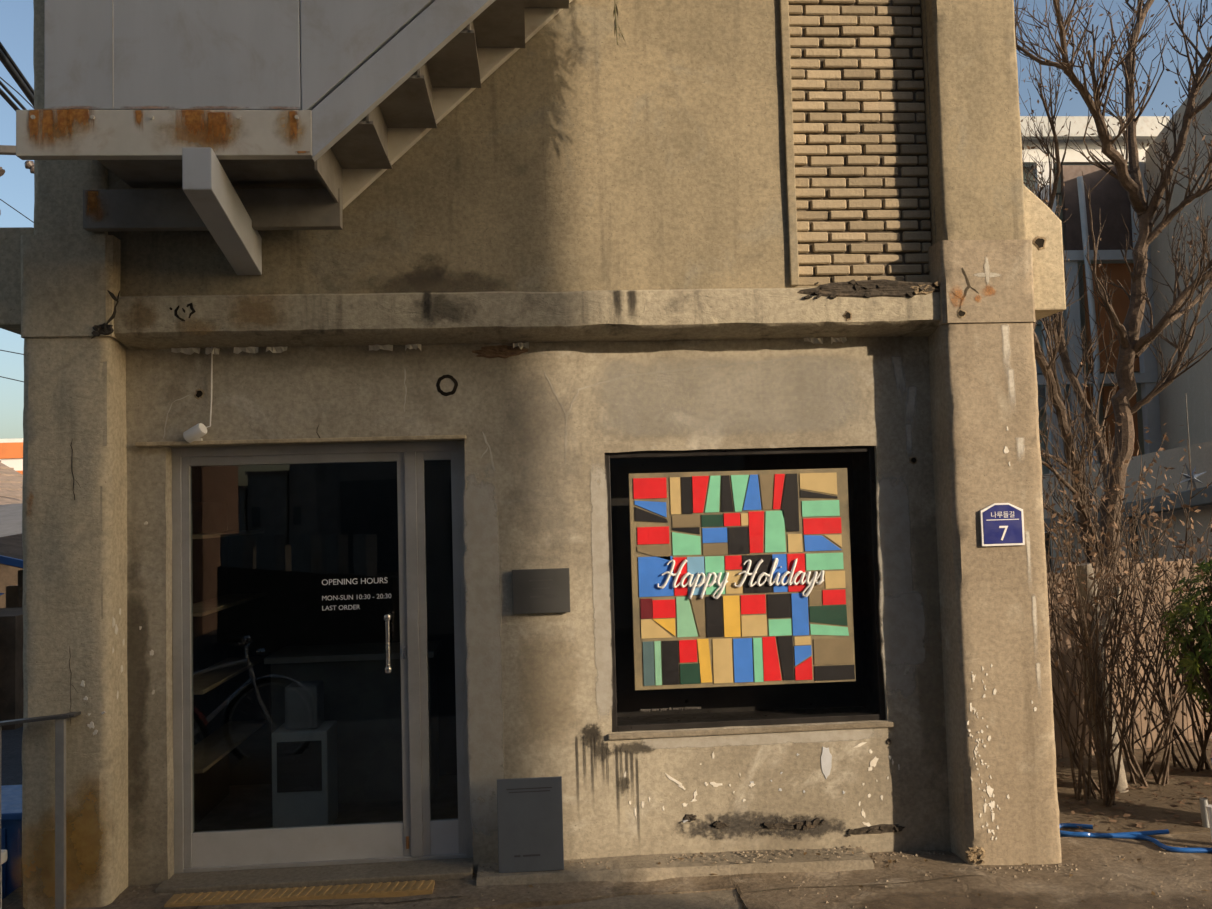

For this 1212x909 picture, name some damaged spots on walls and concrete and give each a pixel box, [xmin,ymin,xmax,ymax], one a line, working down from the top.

rust [28,109,89,140]
rust [176,110,232,149]
rust [282,111,306,153]
leakage [384,273,498,316]
spalling [797,279,941,299]
peeling [171,346,288,355]
leakage [576,725,654,829]
peeling [665,773,755,823]
peeling [965,664,1010,864]
leakage [680,812,845,840]